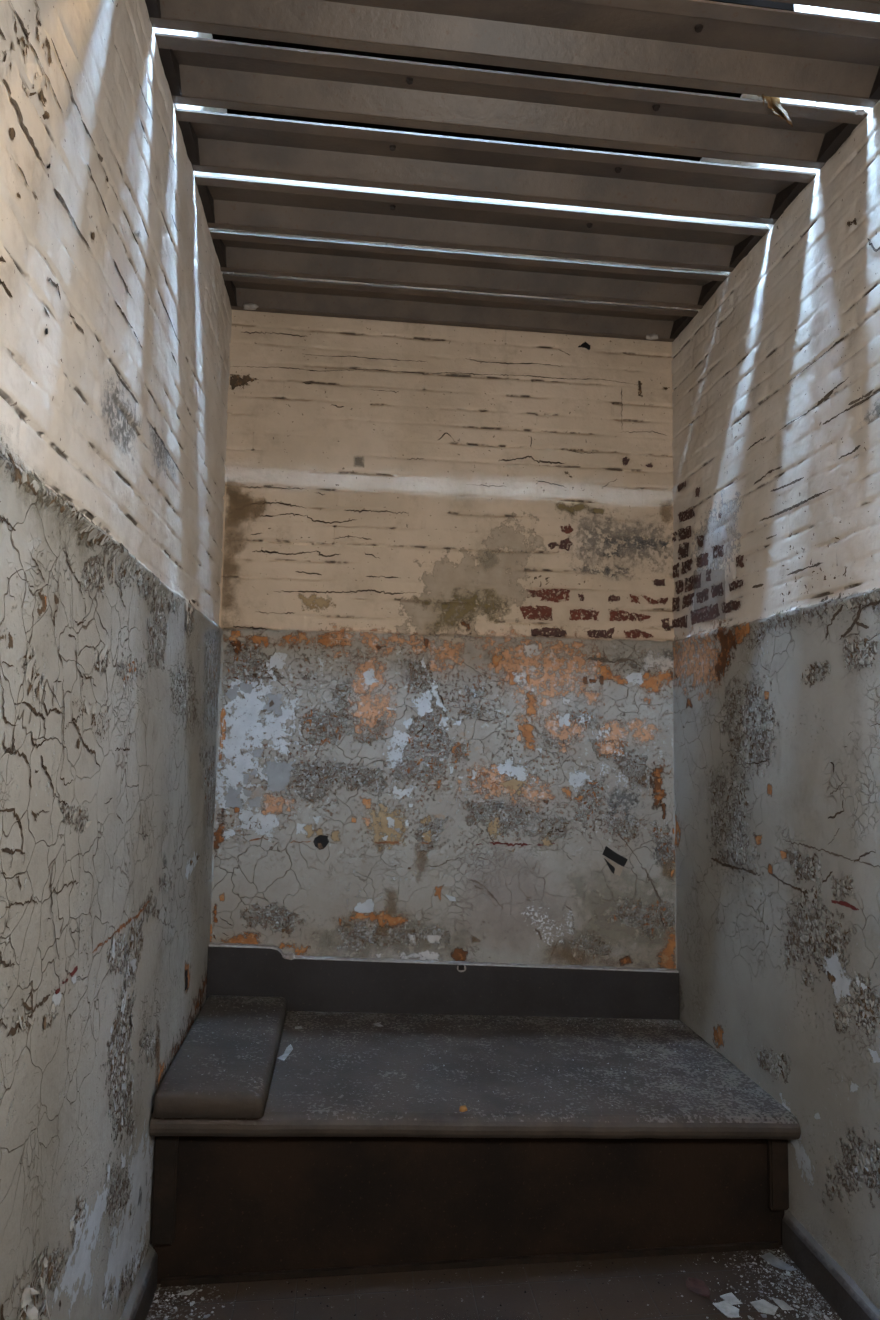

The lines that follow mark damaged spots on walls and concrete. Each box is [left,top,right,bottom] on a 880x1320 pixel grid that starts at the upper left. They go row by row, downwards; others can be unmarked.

crack [0,501,154,1037]
crack [104,798,183,840]
leakage [222,488,265,608]
peeling [0,443,675,868]
leakage [414,589,508,633]
spalling [520,481,744,639]
peeling [704,538,880,883]
crack [711,723,880,904]
crack [825,600,880,640]
peeling [779,848,880,1063]
peeling [14,873,172,1320]
peeling [713,1253,832,1320]